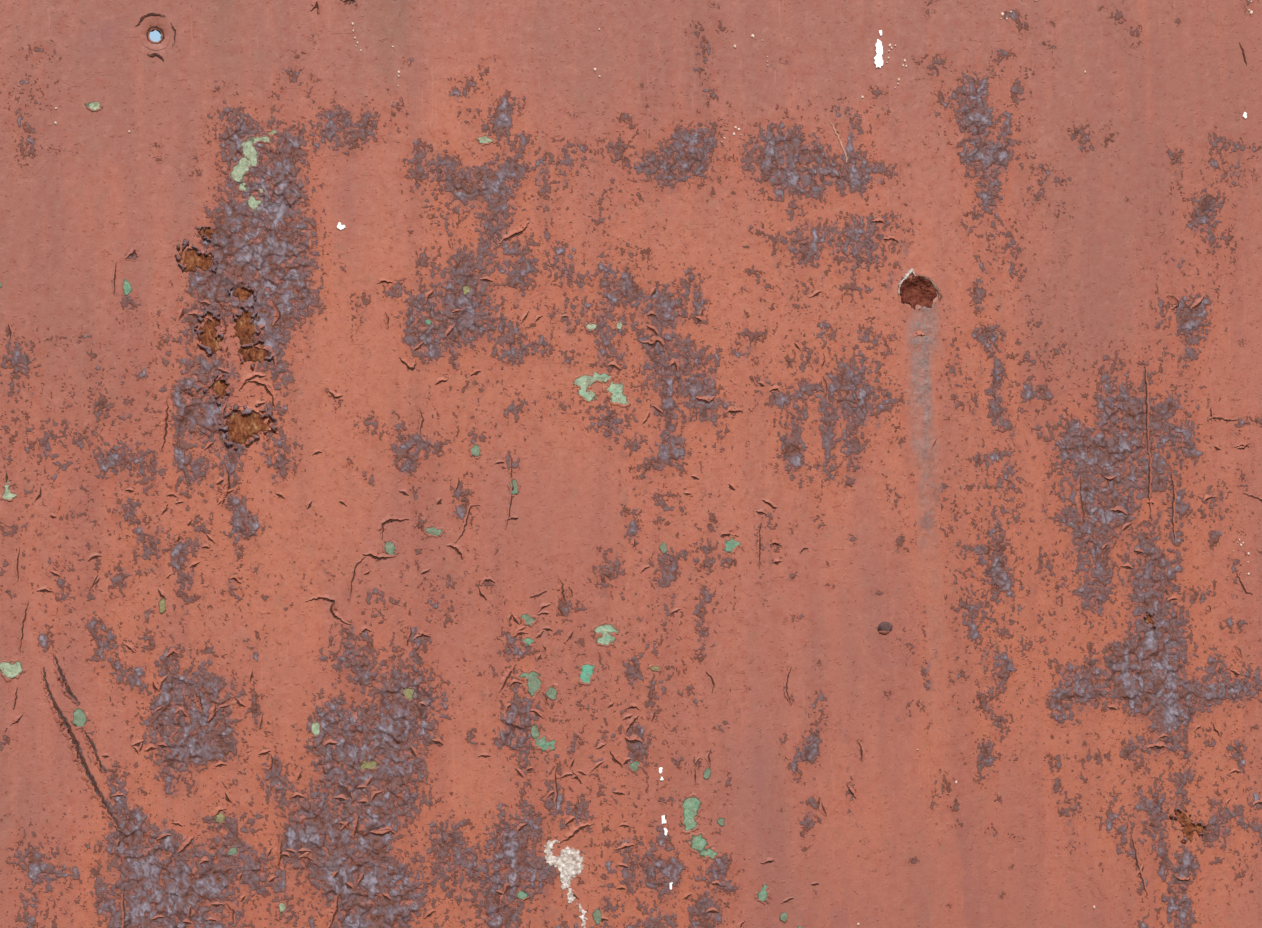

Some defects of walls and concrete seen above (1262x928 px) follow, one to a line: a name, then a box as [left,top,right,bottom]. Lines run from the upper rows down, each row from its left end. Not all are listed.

peeling [476,133,498,146]
peeling [228,129,279,213]
peeling [573,370,631,407]
peeling [308,720,321,737]